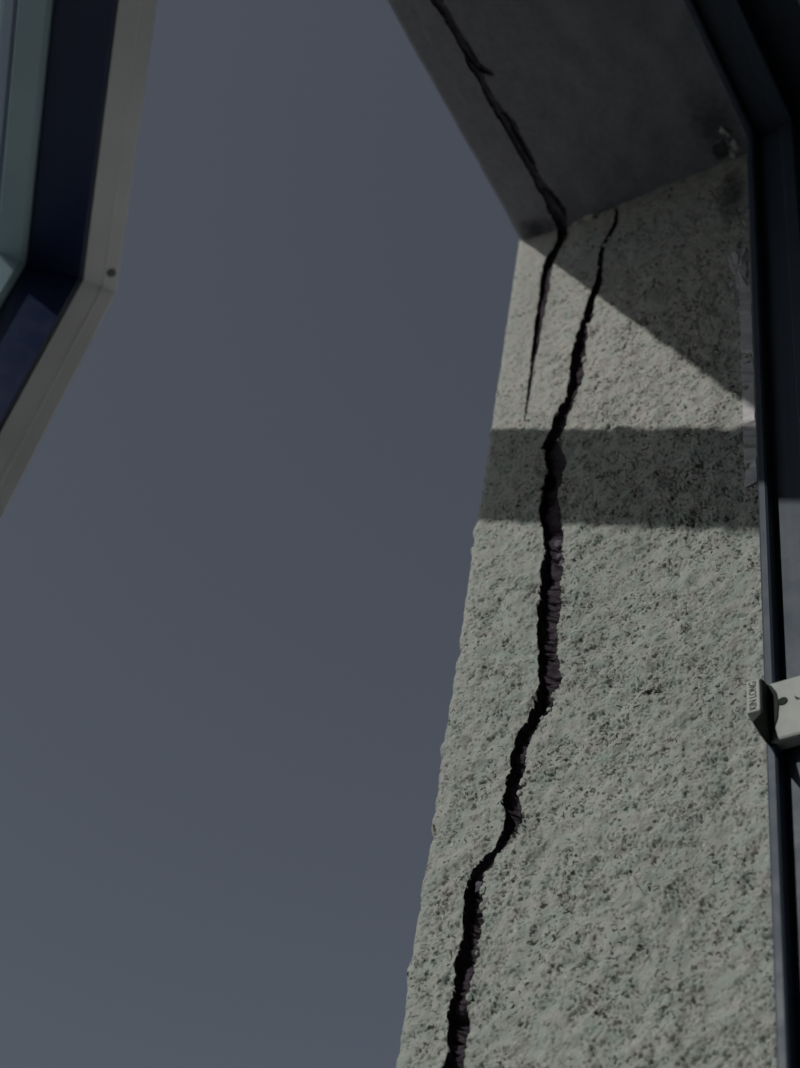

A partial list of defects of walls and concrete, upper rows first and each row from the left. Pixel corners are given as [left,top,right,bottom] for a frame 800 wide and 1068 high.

crack [431,0,568,421]
crack [441,207,619,1068]